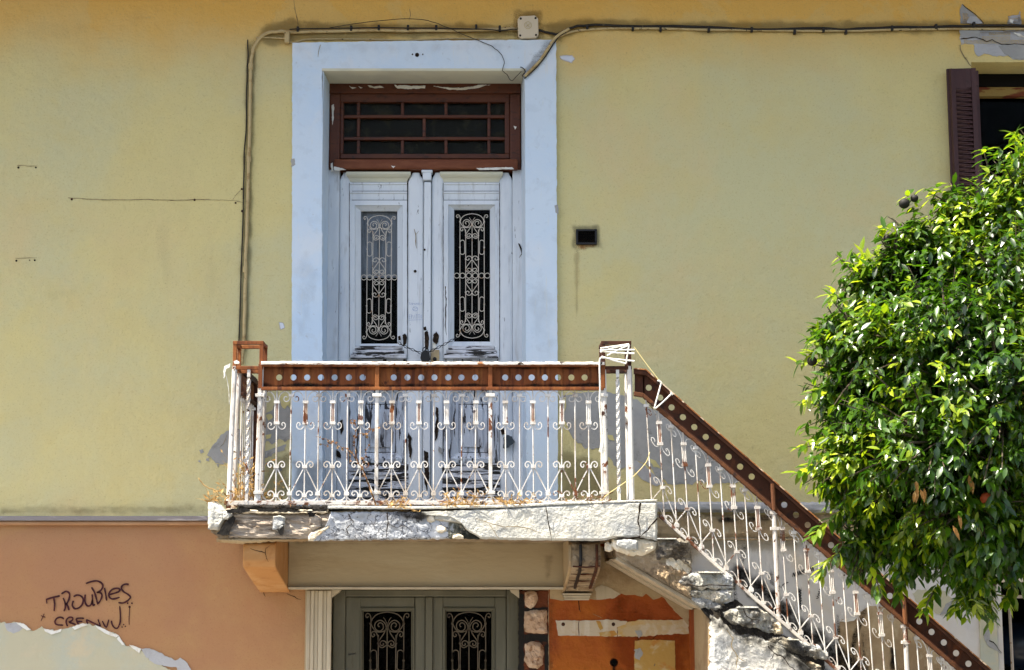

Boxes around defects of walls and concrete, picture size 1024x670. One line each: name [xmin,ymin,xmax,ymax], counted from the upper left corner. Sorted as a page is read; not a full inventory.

flaking render [959,4,1024,60]
flaking render [198,429,246,466]
flaking render [560,392,738,486]
spalling [216,508,330,544]
spalling [427,515,479,540]
crack [616,503,658,539]
flaking render [0,622,191,670]